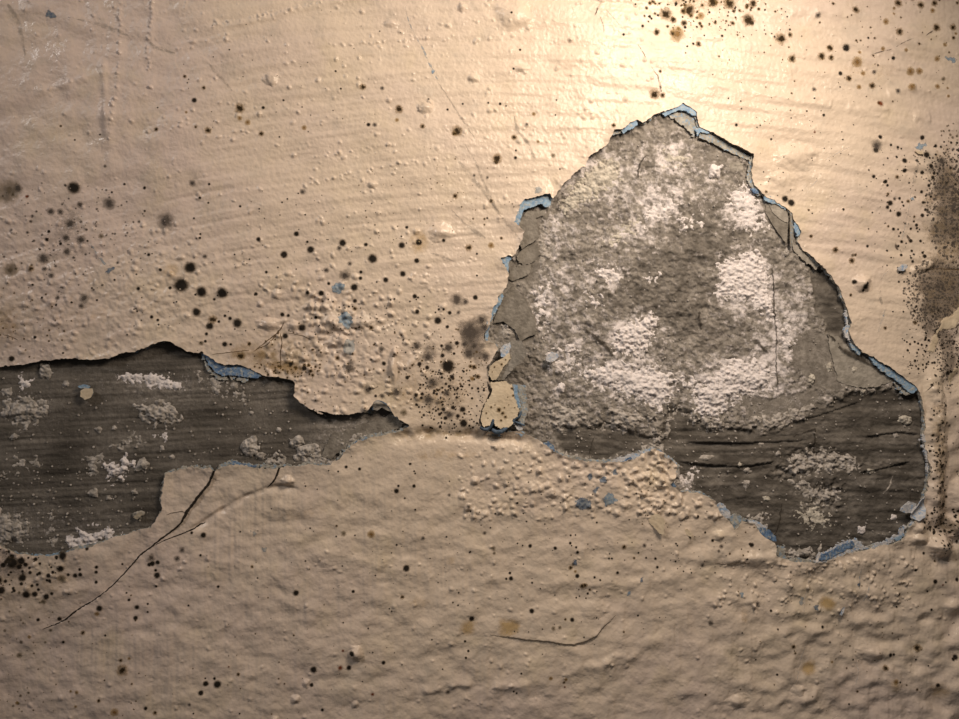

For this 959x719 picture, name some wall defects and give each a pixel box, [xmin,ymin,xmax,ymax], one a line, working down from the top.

damp [635,0,802,63]
damp [819,1,957,105]
damp [2,182,146,307]
peeling [479,103,930,563]
peeling [0,341,409,557]
damp [0,549,82,612]
crack [44,471,215,629]